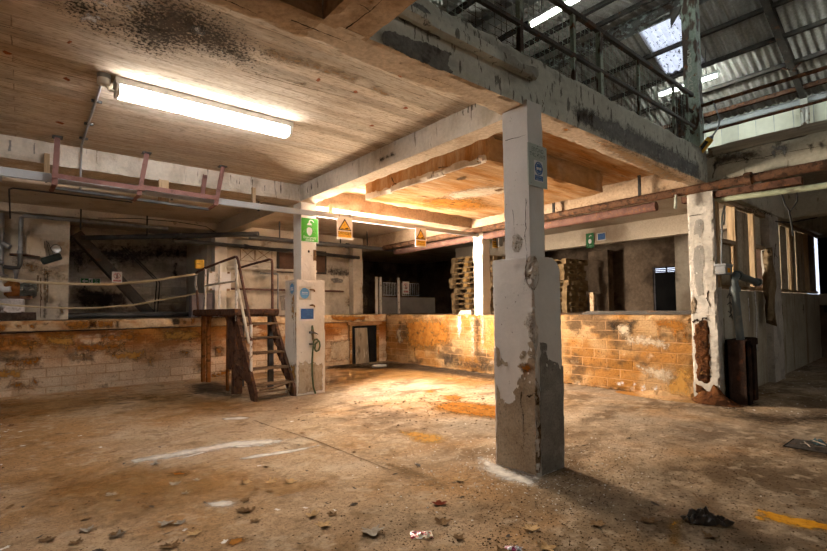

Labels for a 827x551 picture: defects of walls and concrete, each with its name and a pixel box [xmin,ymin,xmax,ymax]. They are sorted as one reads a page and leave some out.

leakage [47,0,356,82]
leakage [331,317,495,380]
leakage [187,382,239,398]
peeling [496,312,565,475]